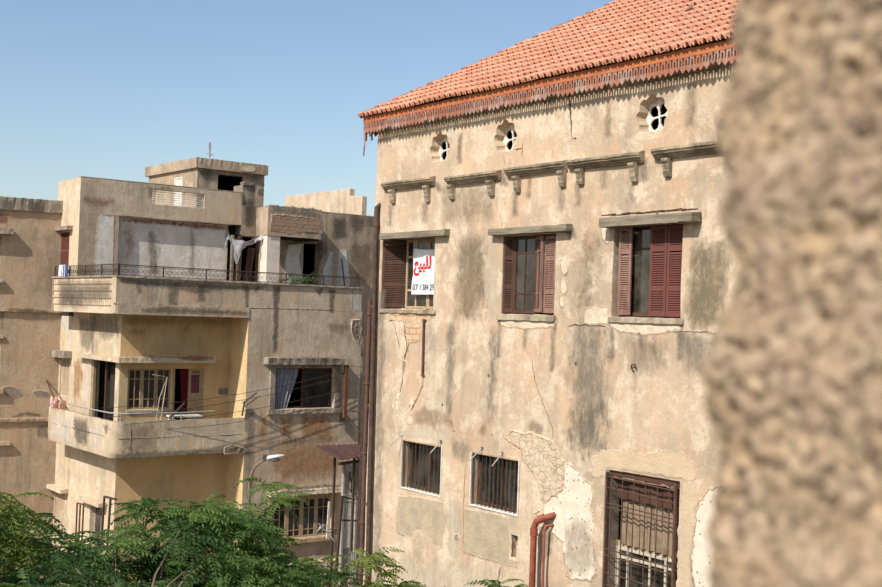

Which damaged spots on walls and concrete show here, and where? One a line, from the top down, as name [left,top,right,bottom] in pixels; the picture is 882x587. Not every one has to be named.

water stain [59,283,108,305]
water stain [61,317,118,350]
water stain [124,237,258,314]
crack [389,319,424,417]
flaking render [388,308,434,344]
water stain [459,239,497,312]
crack [531,355,554,440]
water stain [576,334,603,443]
flaking render [503,429,597,583]
flaking render [689,484,717,587]